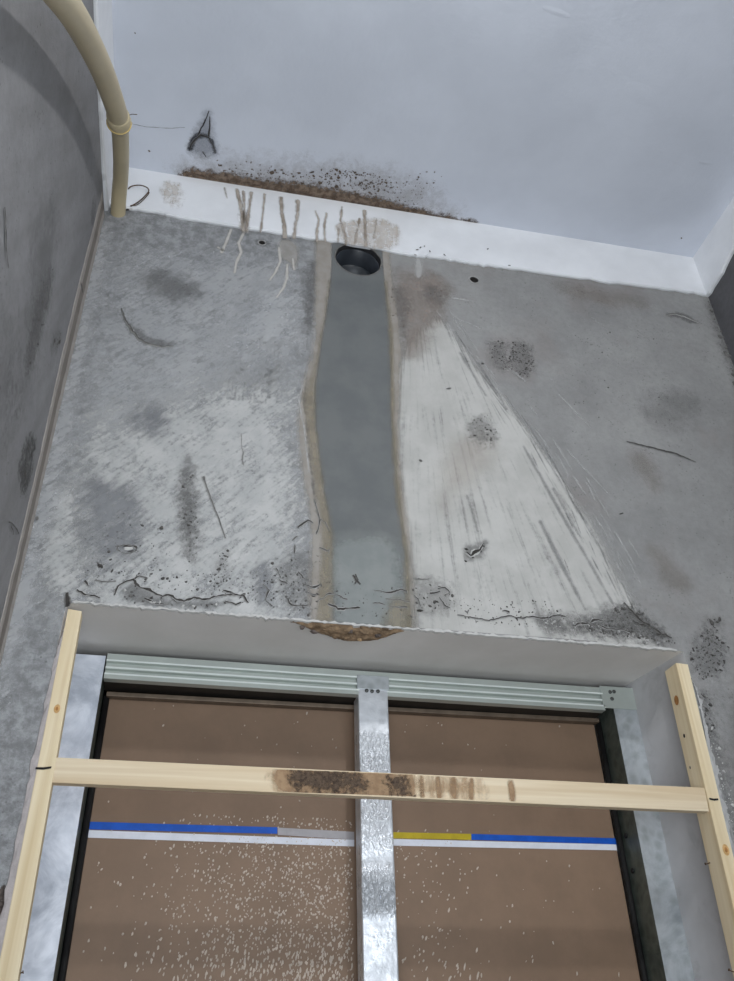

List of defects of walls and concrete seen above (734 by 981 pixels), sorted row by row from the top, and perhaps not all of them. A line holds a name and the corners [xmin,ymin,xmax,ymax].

leakage [0,160,658,697]
crack [626,441,695,462]
crack [64,500,672,638]
spalling [72,474,677,653]
spalling [690,617,734,832]